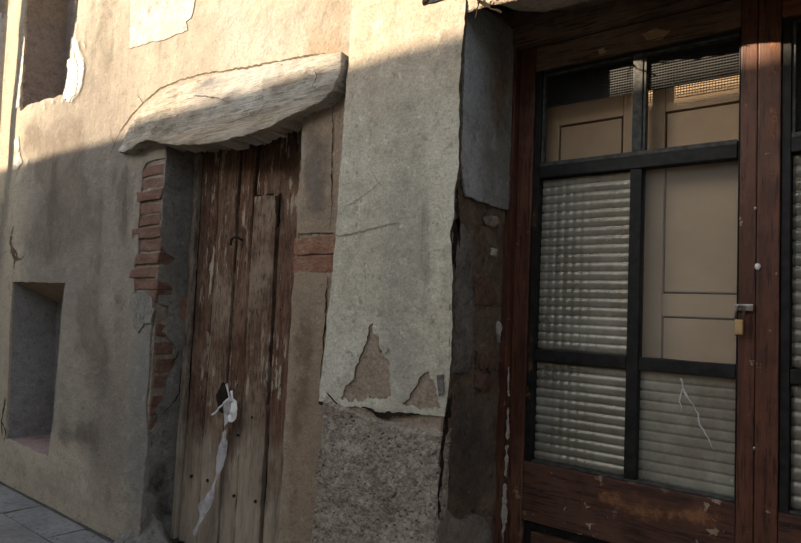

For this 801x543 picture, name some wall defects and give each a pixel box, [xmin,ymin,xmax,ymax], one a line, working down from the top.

crack [475,0,502,18]
flaking render [129,164,175,302]
flaking render [148,324,175,430]
flaking render [342,324,391,402]
flaking render [404,372,444,409]
peeling [501,408,510,538]